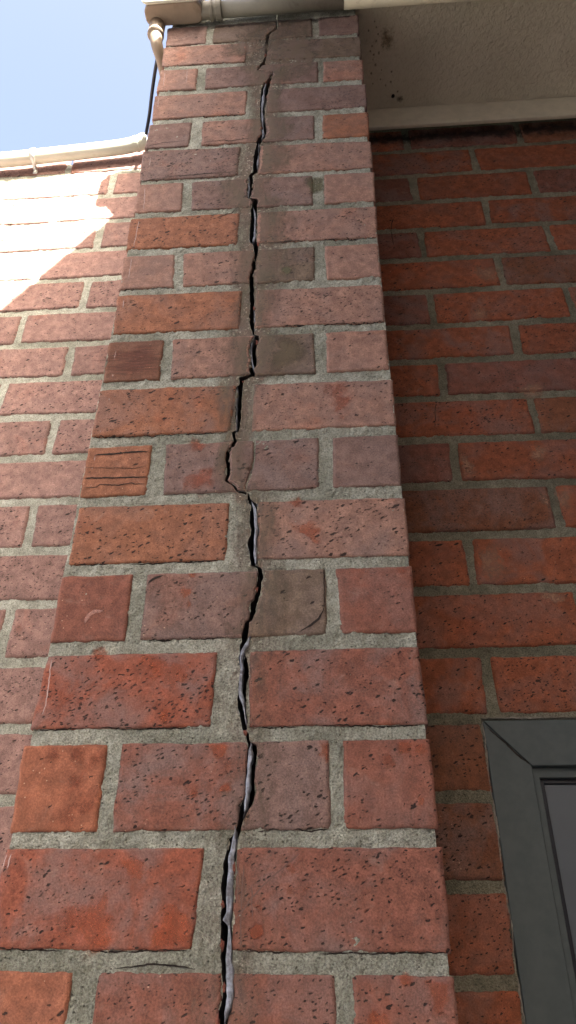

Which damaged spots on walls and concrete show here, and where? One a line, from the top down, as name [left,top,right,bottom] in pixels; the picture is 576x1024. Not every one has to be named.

crack [77,17,394,1024]
crack [323,721,423,729]
crack [0,945,59,953]
crack [320,949,444,957]